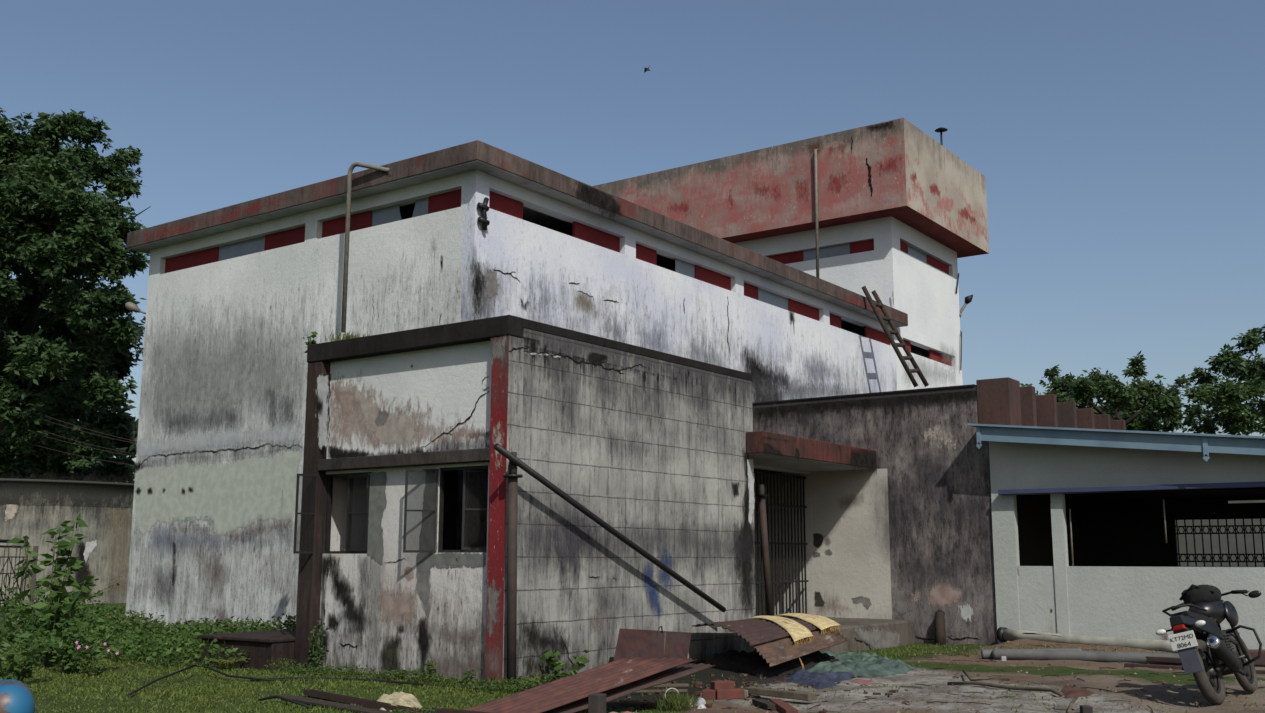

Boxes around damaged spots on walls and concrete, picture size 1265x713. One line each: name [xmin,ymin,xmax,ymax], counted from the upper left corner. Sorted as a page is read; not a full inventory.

crack [851,137,873,196]
damp [472,263,491,311]
crack [140,374,331,465]
peeling [315,375,502,469]
crack [423,347,647,447]
damp [732,450,756,613]
peeling [813,533,833,557]
damp [319,556,379,665]
peeling [815,592,825,607]
peeling [852,596,871,610]
damp [418,620,478,678]
damp [519,622,566,659]